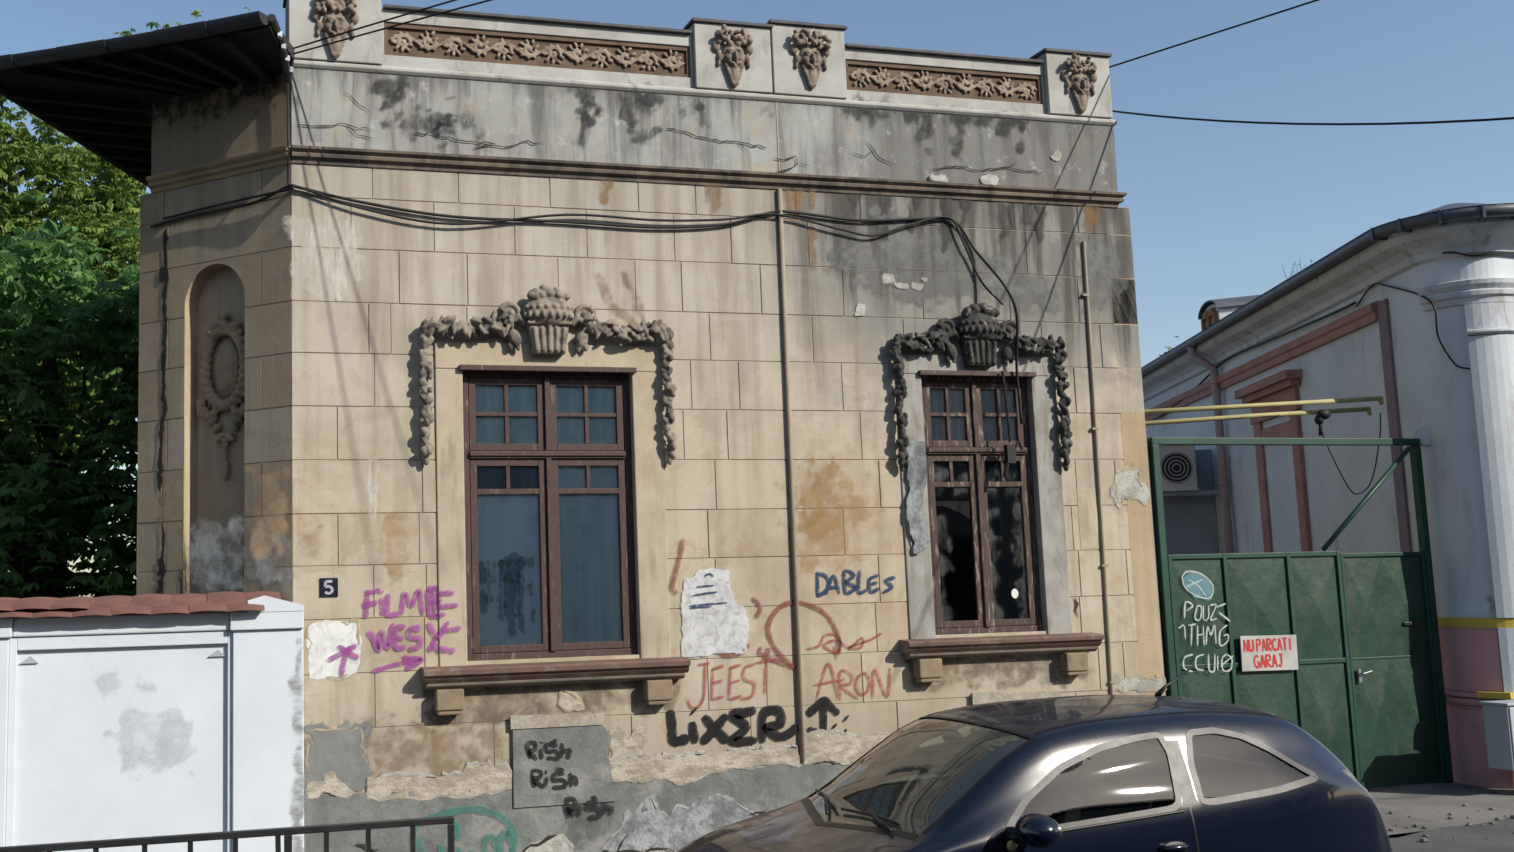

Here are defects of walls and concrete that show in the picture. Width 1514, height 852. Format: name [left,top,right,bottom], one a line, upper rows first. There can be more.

crack [297,92,371,138]
leakage [373,74,473,148]
crack [413,132,544,152]
leakage [569,87,601,145]
leakage [845,96,934,150]
leakage [951,114,1026,155]
leakage [827,193,1059,311]
crack [156,228,169,594]
peeling [1110,463,1150,509]
peeling [304,726,514,803]
peeling [602,725,891,852]
peeling [525,833,574,852]